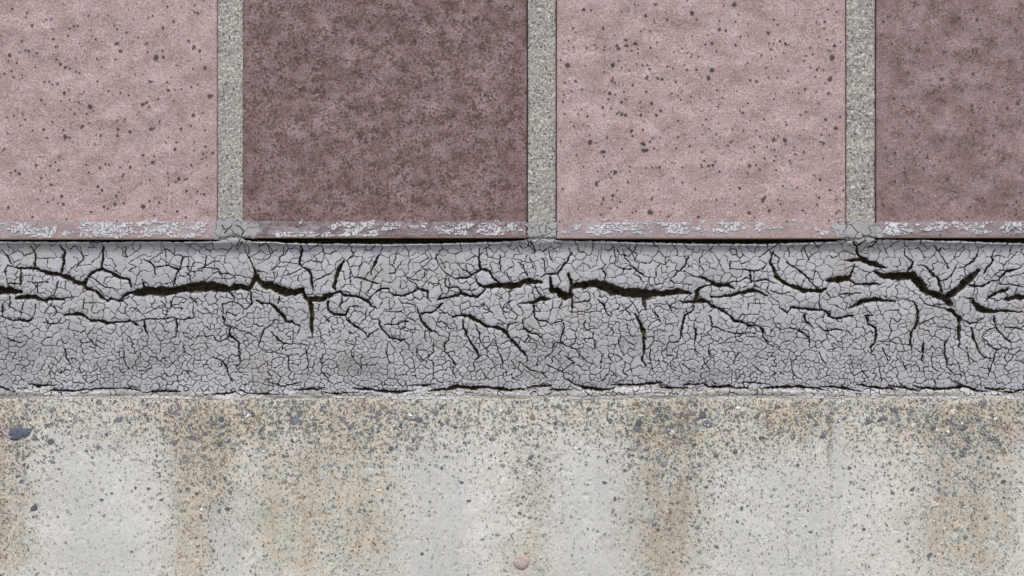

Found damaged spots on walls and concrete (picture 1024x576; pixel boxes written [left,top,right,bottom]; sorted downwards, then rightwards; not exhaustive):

peeling [0,219,216,239]
peeling [254,220,526,237]
peeling [558,219,795,238]
peeling [882,220,1024,236]
crack [0,219,1024,399]